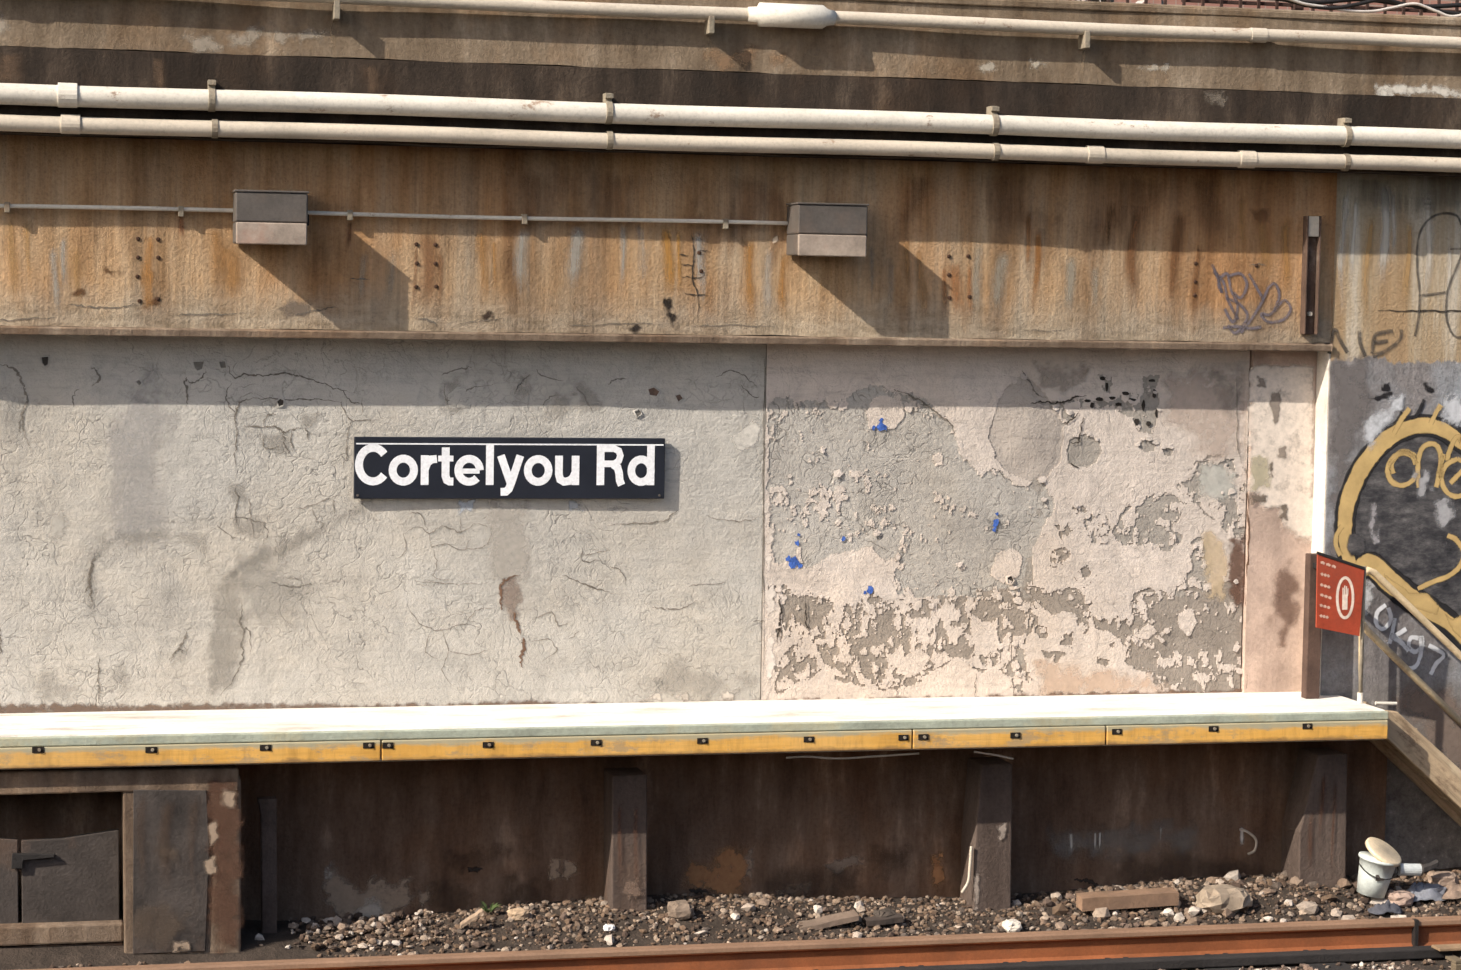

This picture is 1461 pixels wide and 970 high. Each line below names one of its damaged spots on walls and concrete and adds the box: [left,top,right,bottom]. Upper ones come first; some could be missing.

crack [573,235,761,327]
rust [1027,217,1040,287]
rust [1127,214,1140,289]
rust [1170,217,1200,302]
crack [183,366,377,539]
crack [562,363,809,667]
peeling [733,358,1392,694]
crack [85,555,96,606]
crack [398,512,576,686]
crack [225,603,252,689]
rust [550,859,576,879]
rust [685,846,749,895]